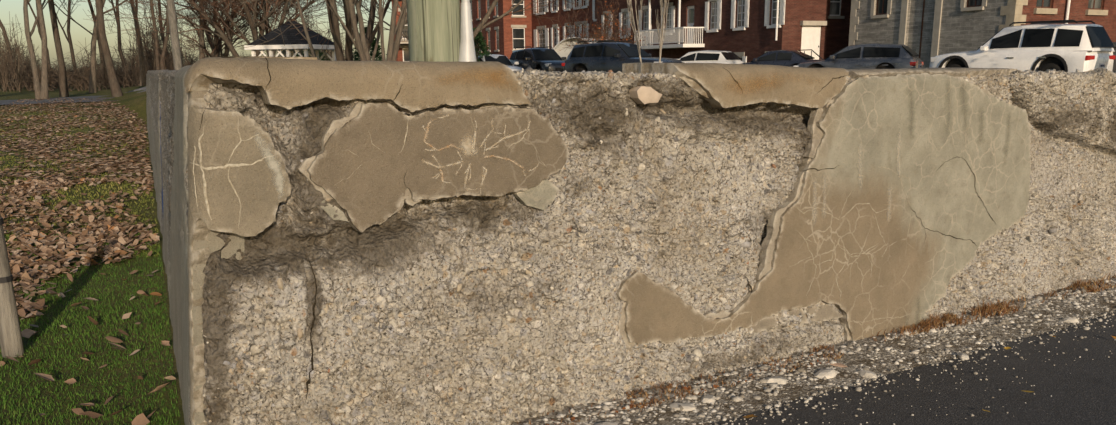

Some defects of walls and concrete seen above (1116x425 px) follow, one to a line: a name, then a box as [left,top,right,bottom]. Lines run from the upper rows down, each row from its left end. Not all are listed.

crack [190,107,277,229]
crack [335,85,545,189]
spalling [187,66,1116,425]
crack [793,193,978,298]
crack [305,261,317,403]